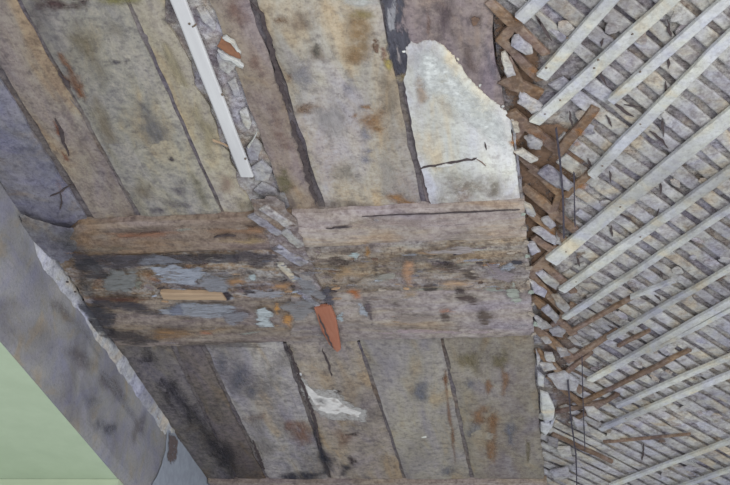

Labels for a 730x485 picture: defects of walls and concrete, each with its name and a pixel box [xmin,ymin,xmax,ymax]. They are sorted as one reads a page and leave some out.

peeling [217,35,244,67]
crack [419,143,487,170]
crack [326,209,520,229]
leakage [64,232,277,345]
peeling [93,234,538,336]
leakage [389,256,478,280]
leakage [454,289,492,325]
flaking render [34,242,209,485]
peeling [297,373,367,422]
flaking render [536,349,556,435]